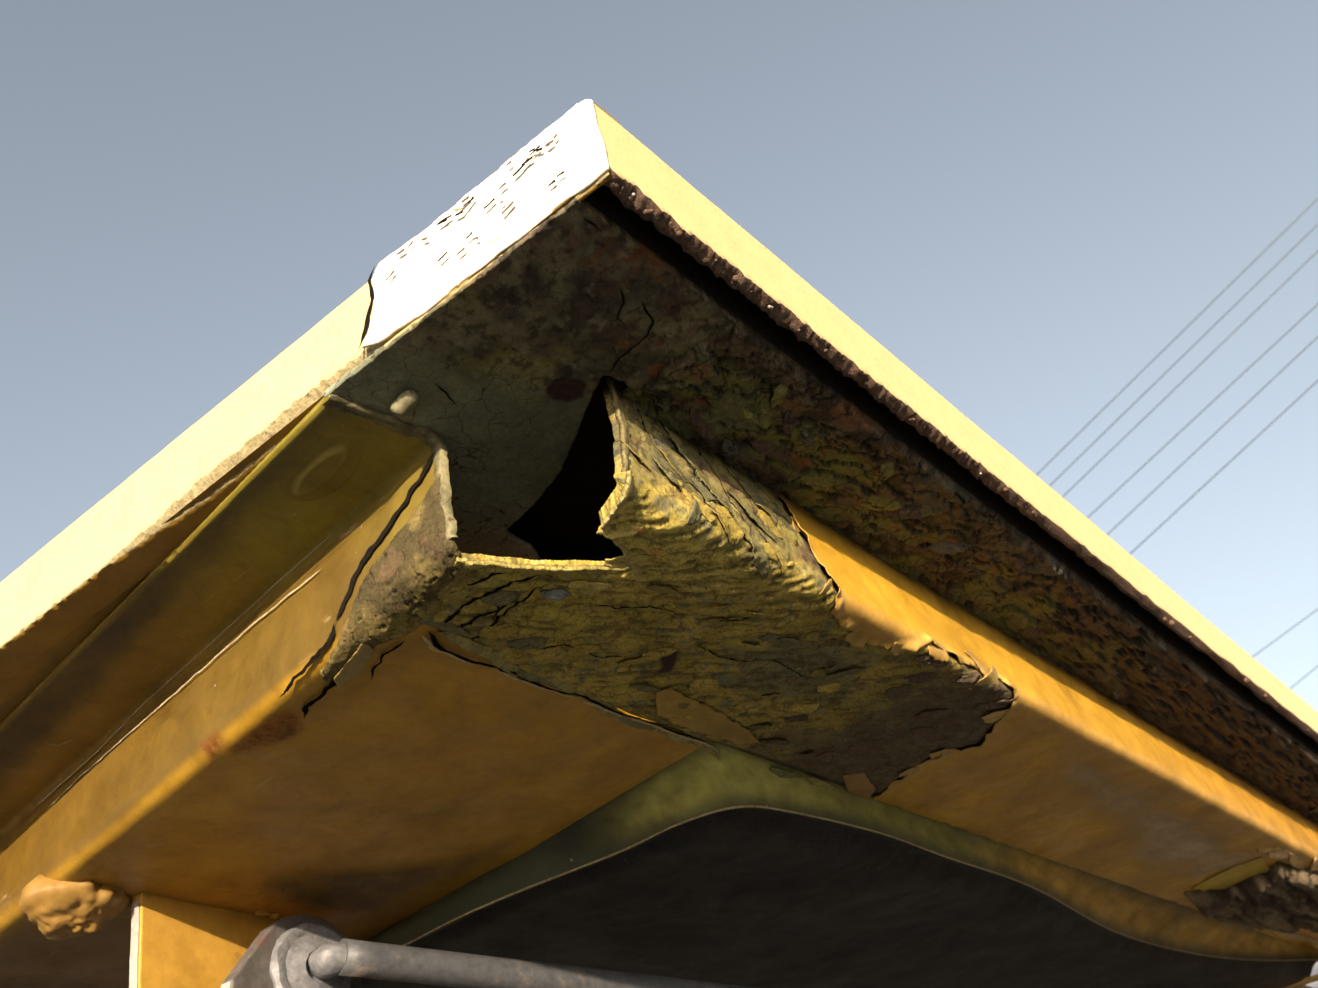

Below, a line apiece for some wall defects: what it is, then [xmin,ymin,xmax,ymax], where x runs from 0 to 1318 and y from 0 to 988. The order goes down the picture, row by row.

crack [358,265,375,351]
crack [609,288,654,373]
crack [280,451,435,719]
peeling [422,630,760,747]
peeling [927,642,999,689]
peeling [981,709,1016,723]
peeling [843,772,875,799]
peeling [1191,847,1318,891]